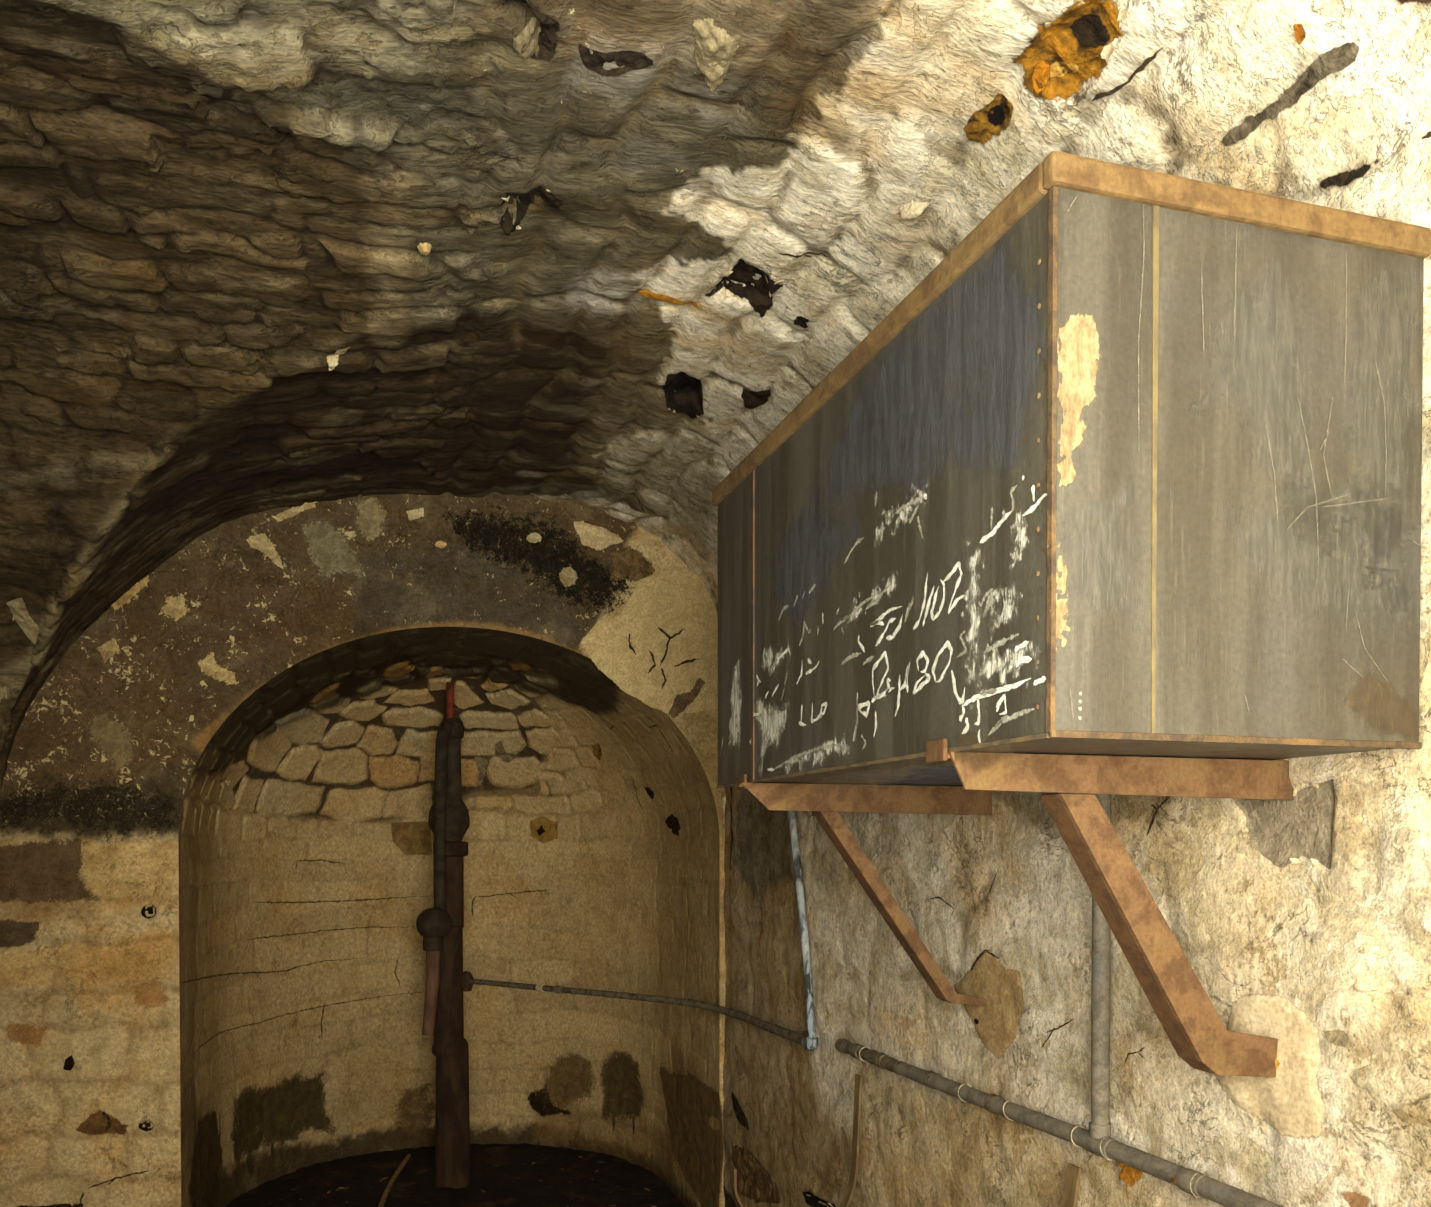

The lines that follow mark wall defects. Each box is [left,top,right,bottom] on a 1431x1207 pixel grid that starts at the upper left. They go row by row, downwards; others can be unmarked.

spalling [503,0,560,61]
spalling [578,45,653,76]
spalling [499,186,563,236]
spalling [705,259,784,317]
spalling [662,372,704,419]
leakage [435,505,635,614]
crack [600,627,701,750]
leakage [0,777,184,904]
leakage [0,919,40,947]
leakage [527,1051,644,1134]
leakage [189,1073,335,1207]
leakage [660,1066,724,1207]